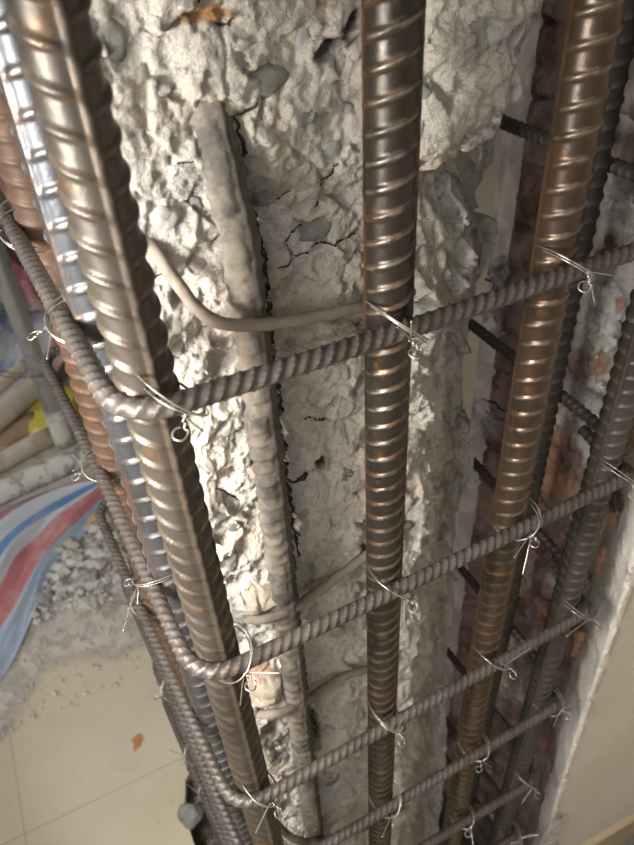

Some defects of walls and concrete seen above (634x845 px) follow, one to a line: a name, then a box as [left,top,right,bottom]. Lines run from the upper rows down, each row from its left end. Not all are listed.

spalling [0,0,180,397]
rust [178,4,237,23]
crack [232,100,263,163]
crack [253,163,358,361]
spalling [313,0,477,332]
spalling [528,0,634,278]
rust [594,234,617,255]
spalling [44,308,241,662]
crack [276,383,314,564]
spalling [364,339,412,595]
spalling [481,279,634,537]
spalling [121,536,319,794]